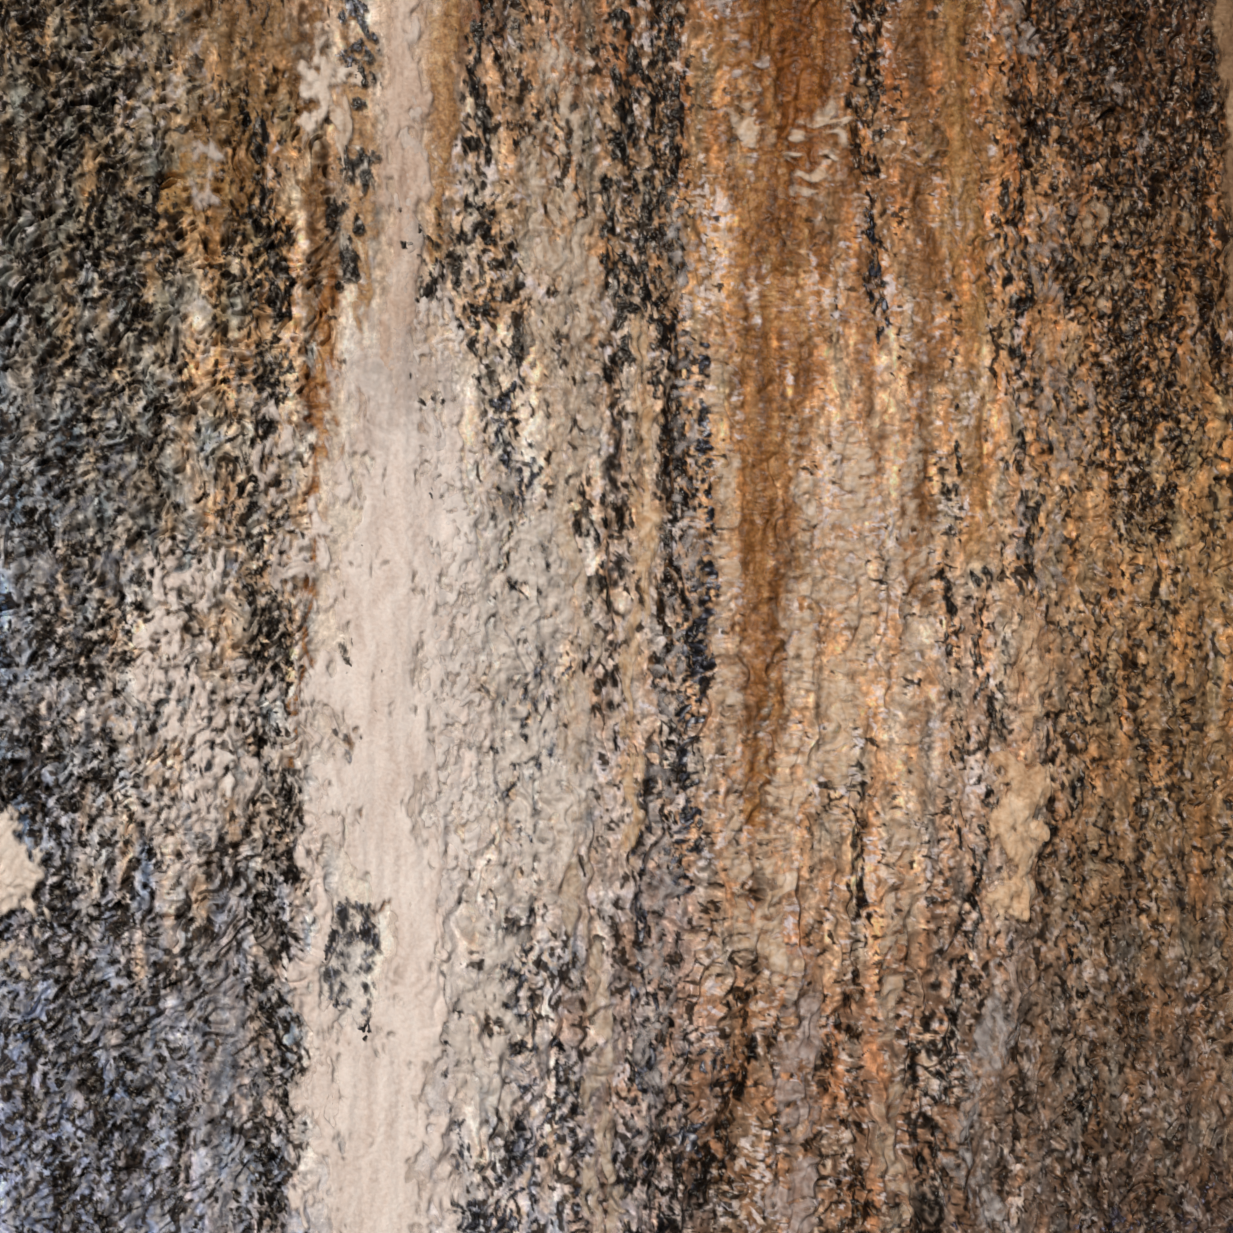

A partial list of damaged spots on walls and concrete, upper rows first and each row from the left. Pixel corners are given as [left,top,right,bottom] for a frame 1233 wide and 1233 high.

rust [158,0,380,497]
rust [288,512,326,768]
leakage [0,0,890,1233]
rust [719,0,850,829]
leakage [764,425,913,1040]
leakage [877,0,1233,1233]